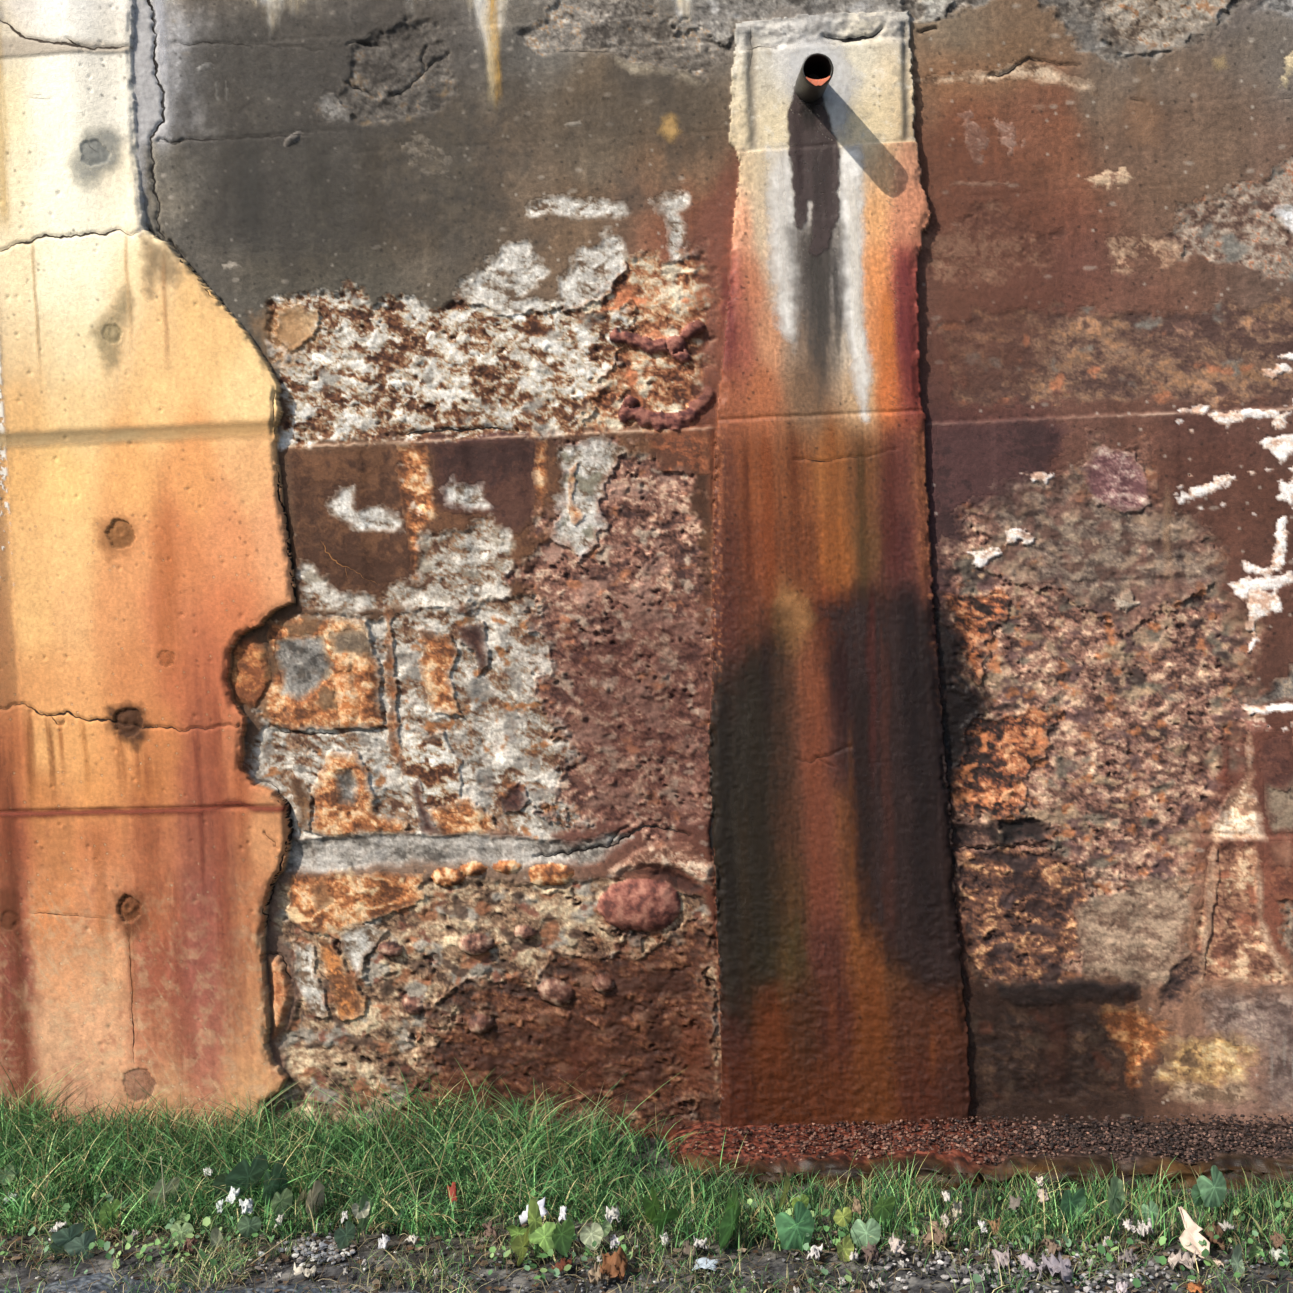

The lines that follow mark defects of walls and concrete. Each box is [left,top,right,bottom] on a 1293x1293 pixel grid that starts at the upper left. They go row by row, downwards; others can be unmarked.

leakage [74,131,119,180]
leakage [131,0,172,143]
crack [0,0,374,304]
leakage [190,0,508,249]
spalling [314,10,463,178]
leakage [761,43,870,421]
crack [0,703,239,732]
corrosion [0,269,294,1133]
spalling [227,188,728,1139]
corrosion [693,141,972,1127]
leakage [819,595,992,986]
spalling [926,157,1293,1120]